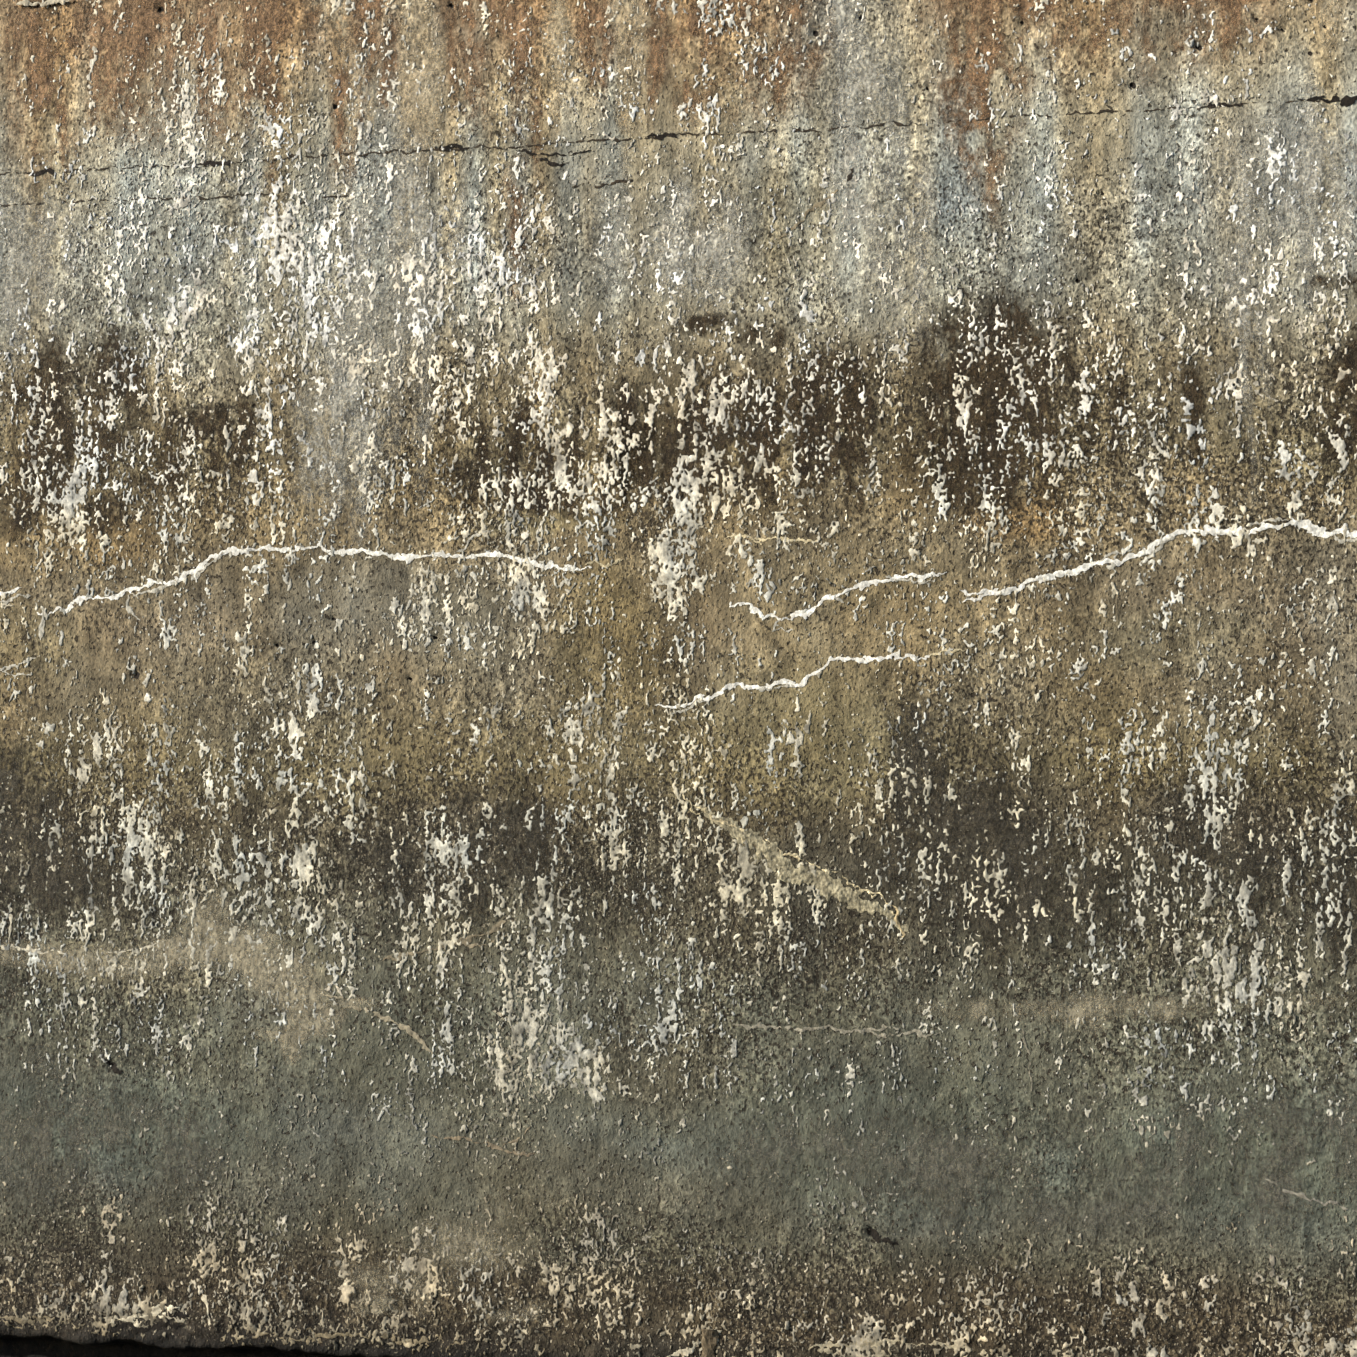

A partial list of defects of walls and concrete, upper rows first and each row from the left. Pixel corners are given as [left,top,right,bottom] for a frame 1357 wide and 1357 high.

rust [4,0,323,161]
rust [332,0,402,173]
crack [0,99,1340,207]
rust [648,0,804,104]
rust [940,0,1060,130]
water stain [3,325,255,535]
water stain [450,346,882,521]
water stain [921,294,1128,511]
crack [0,530,623,679]
crack [656,648,965,715]
crack [726,517,1357,632]
water stain [878,705,1357,966]